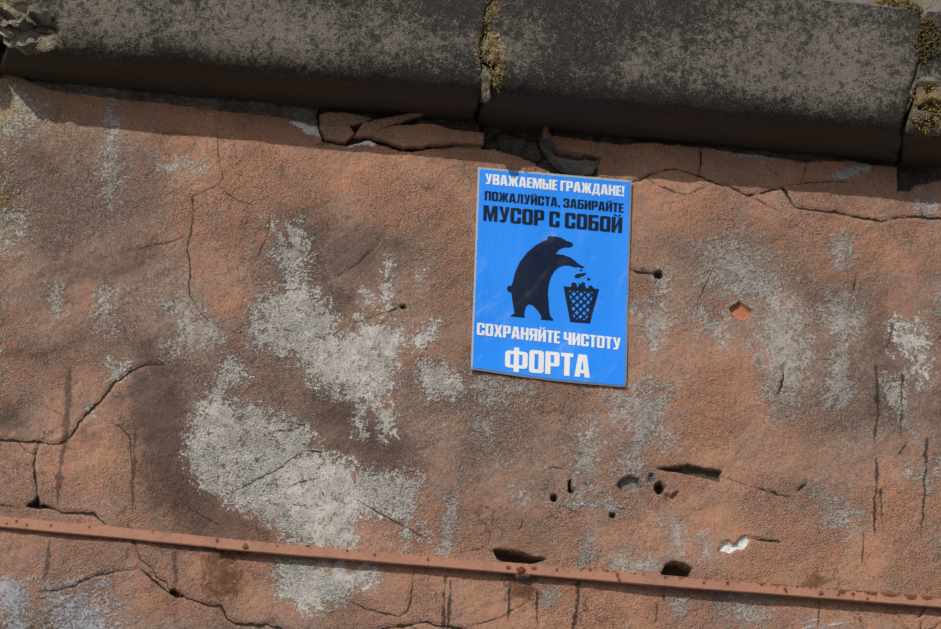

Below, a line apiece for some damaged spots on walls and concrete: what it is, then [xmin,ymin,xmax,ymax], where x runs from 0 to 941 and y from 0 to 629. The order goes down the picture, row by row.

crack [131,111,272,323]
spalling [0,1,941,260]
crack [633,149,941,222]
crack [0,363,164,524]
peeling [102,355,133,388]
crack [39,540,283,629]
damp [130,357,266,540]
peeling [153,212,544,621]
crack [334,570,524,629]
peeling [504,209,941,575]
damp [861,458,883,561]
rust [837,590,932,600]